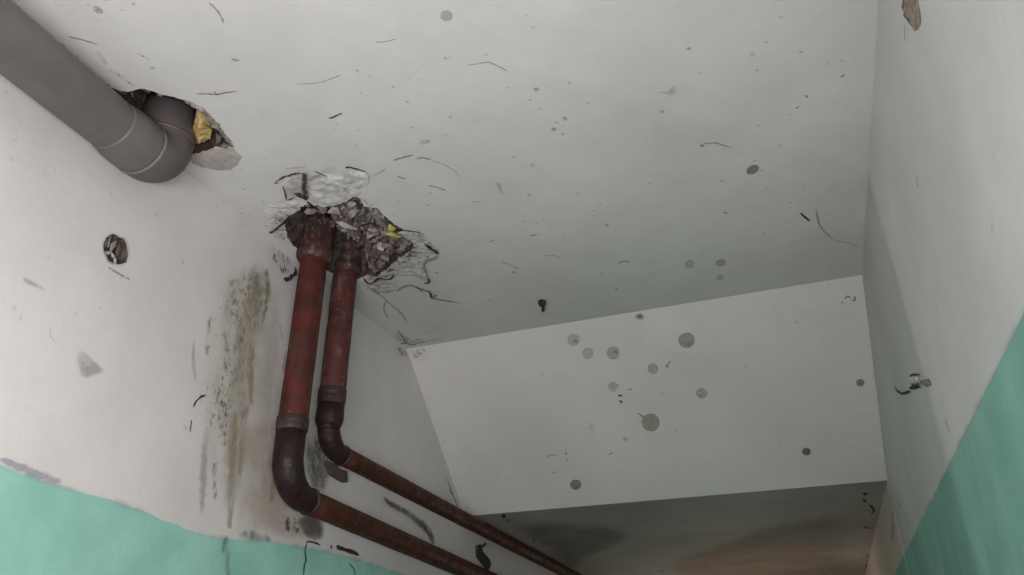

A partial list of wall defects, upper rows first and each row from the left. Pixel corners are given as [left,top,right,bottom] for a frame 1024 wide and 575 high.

spalling [902,0,921,41]
spalling [112,88,163,110]
spalling [183,99,242,171]
spalling [103,234,130,280]
spalling [263,166,458,303]
damp [204,272,269,473]
spalling [895,373,931,395]